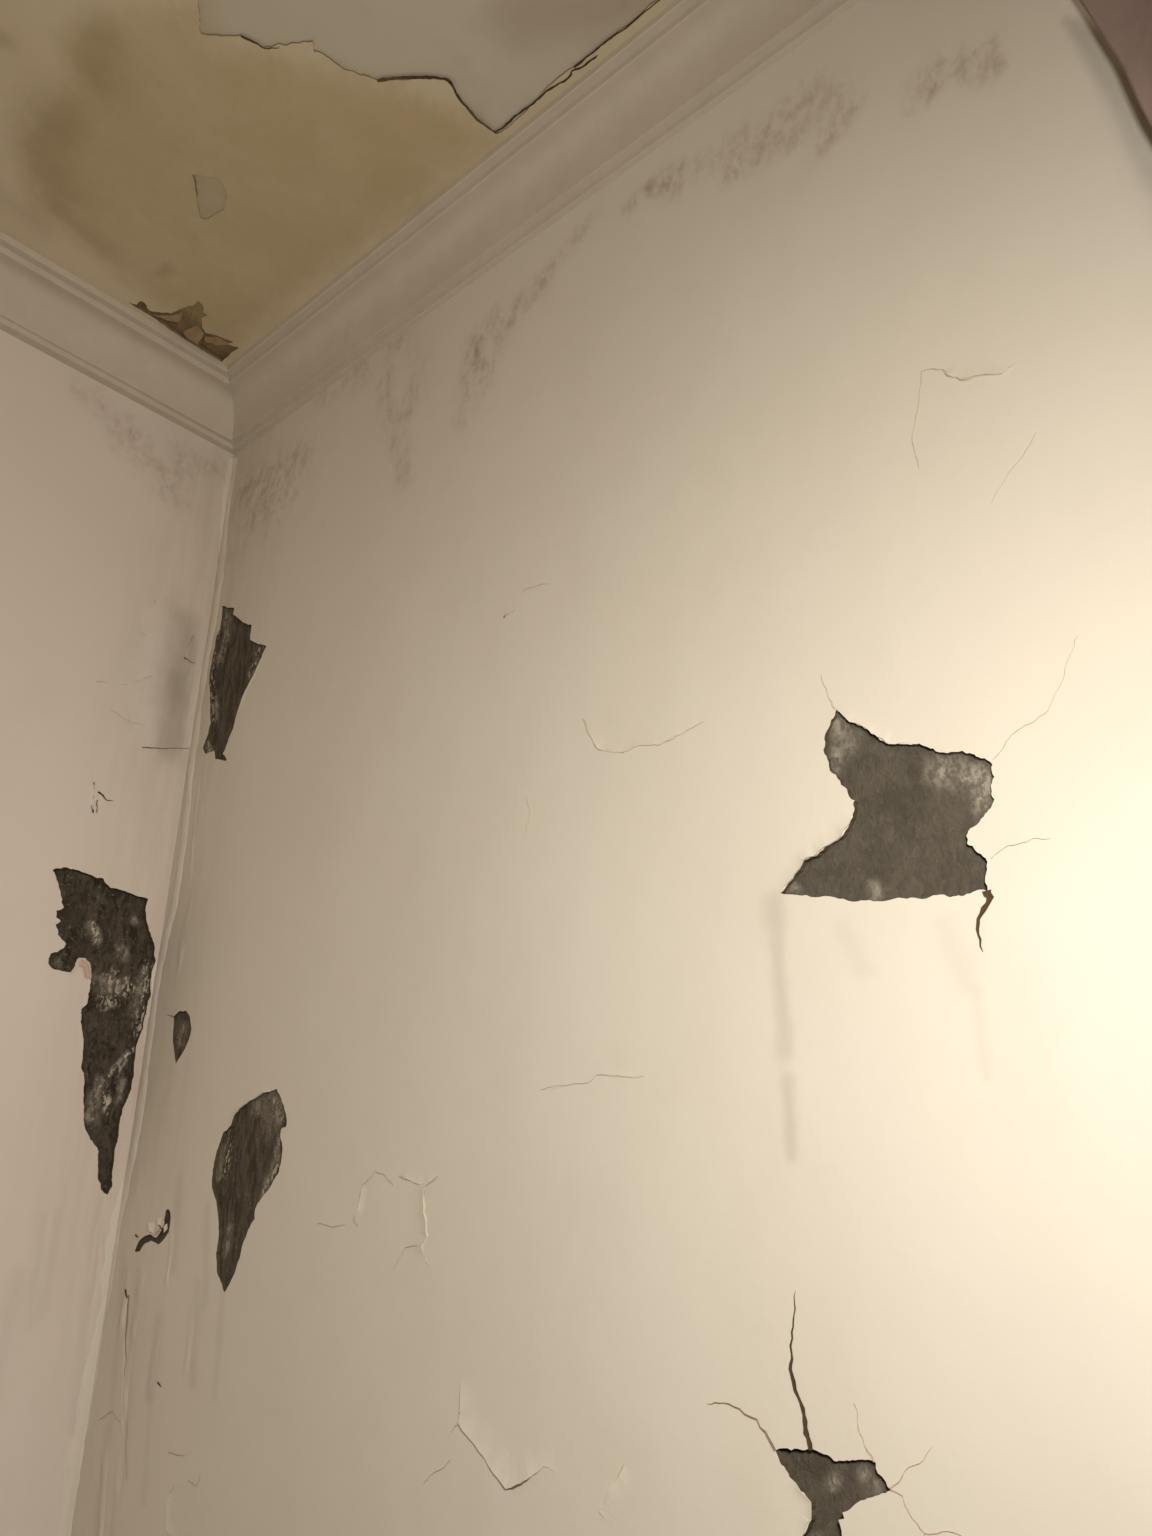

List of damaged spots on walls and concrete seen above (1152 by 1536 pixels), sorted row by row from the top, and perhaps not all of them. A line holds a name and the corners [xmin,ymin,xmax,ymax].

peeling [198,0,660,134]
peeling [129,301,239,362]
peeling [184,606,269,761]
peeling [769,636,1078,951]
peeling [48,867,156,1194]
peeling [169,1011,191,1062]
peeling [212,1080,287,1292]
peeling [712,1294,961,1536]